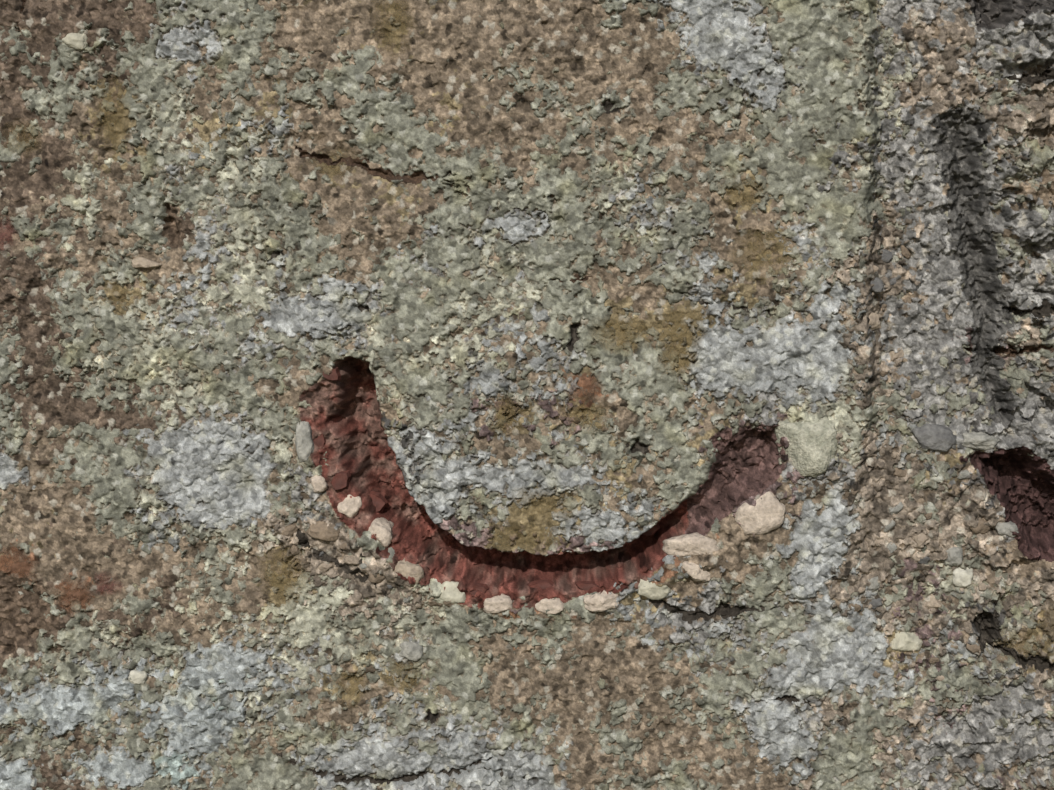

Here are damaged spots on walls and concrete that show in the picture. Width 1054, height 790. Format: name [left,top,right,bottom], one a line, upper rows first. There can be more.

spalling [625,438,652,454]
spalling [959,446,1054,562]